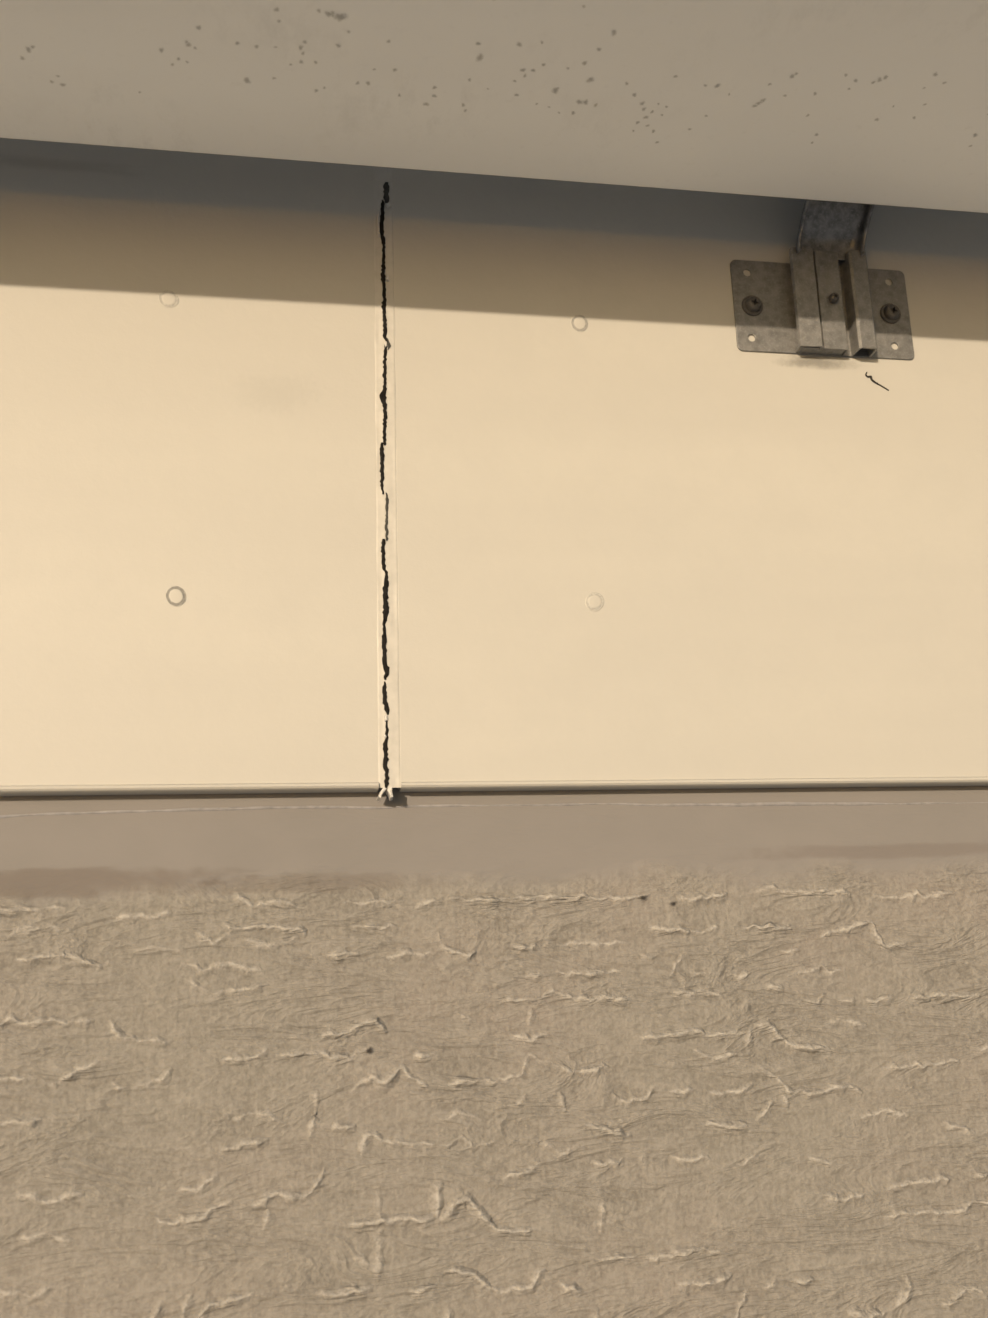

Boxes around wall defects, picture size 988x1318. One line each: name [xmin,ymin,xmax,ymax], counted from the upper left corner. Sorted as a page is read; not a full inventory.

crack [377,182,393,801]